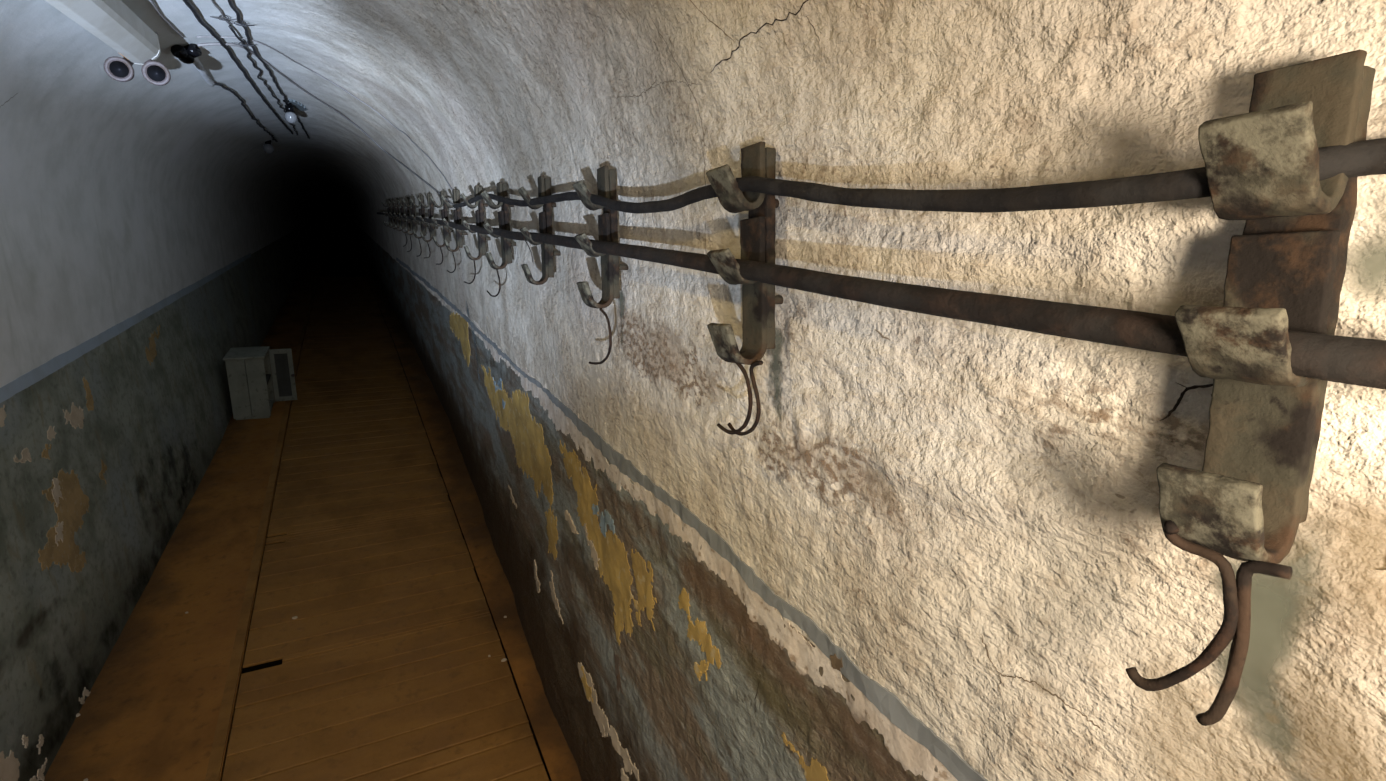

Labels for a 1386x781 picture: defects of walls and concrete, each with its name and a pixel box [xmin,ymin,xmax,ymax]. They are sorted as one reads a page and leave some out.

crack [616,0,819,186]
peeling [13,377,94,573]
peeling [415,276,958,781]
peeling [0,734,47,781]